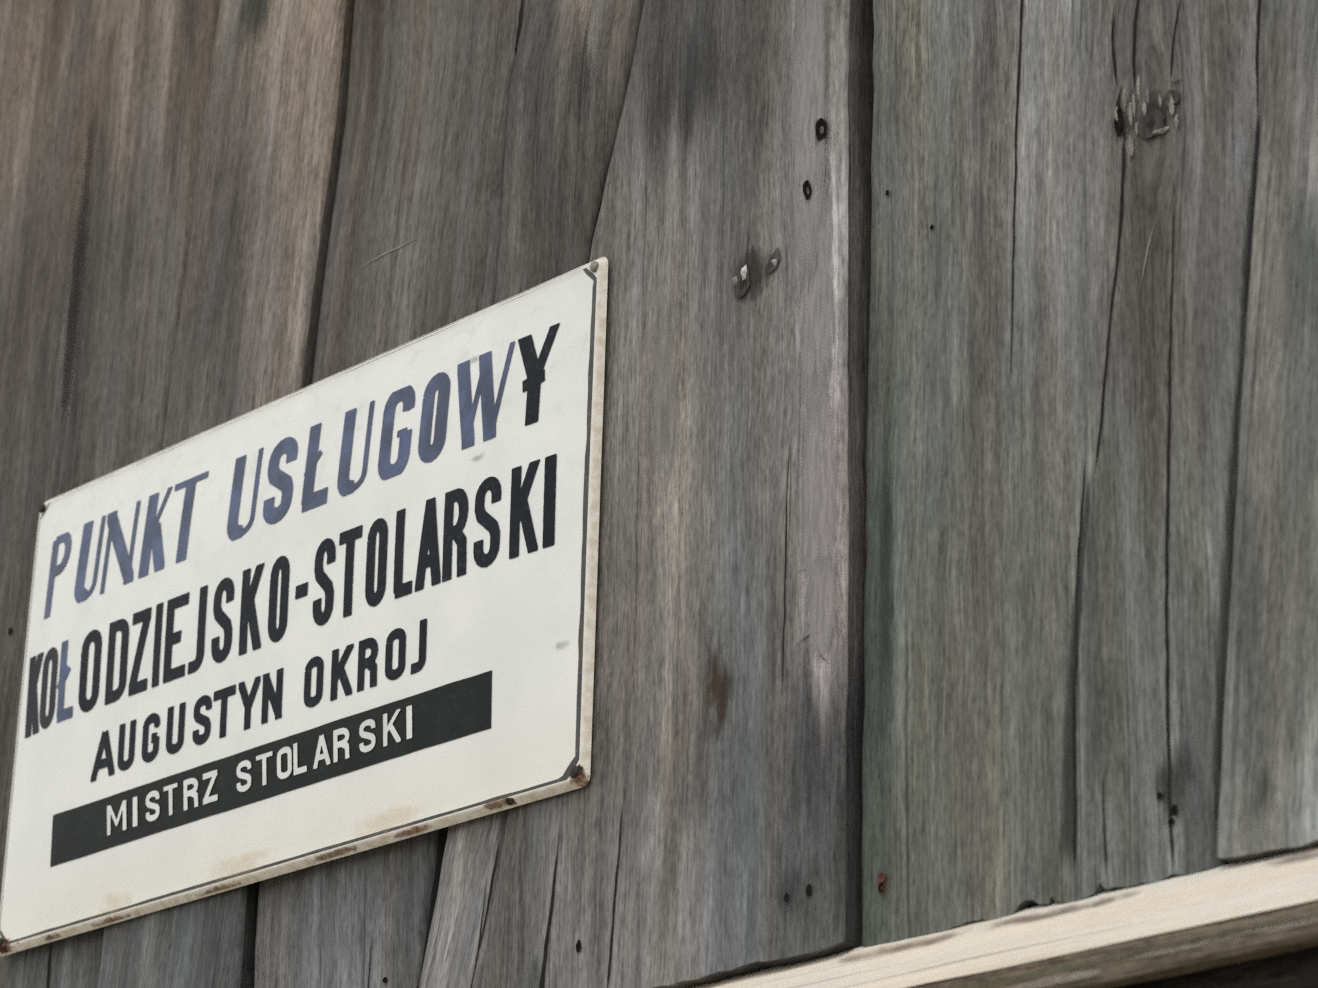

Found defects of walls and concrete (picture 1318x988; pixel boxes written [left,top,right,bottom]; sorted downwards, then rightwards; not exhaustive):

crack [1009,0,1023,390]
crack [1064,0,1139,874]
crack [1164,210,1174,863]
crack [1170,0,1180,81]